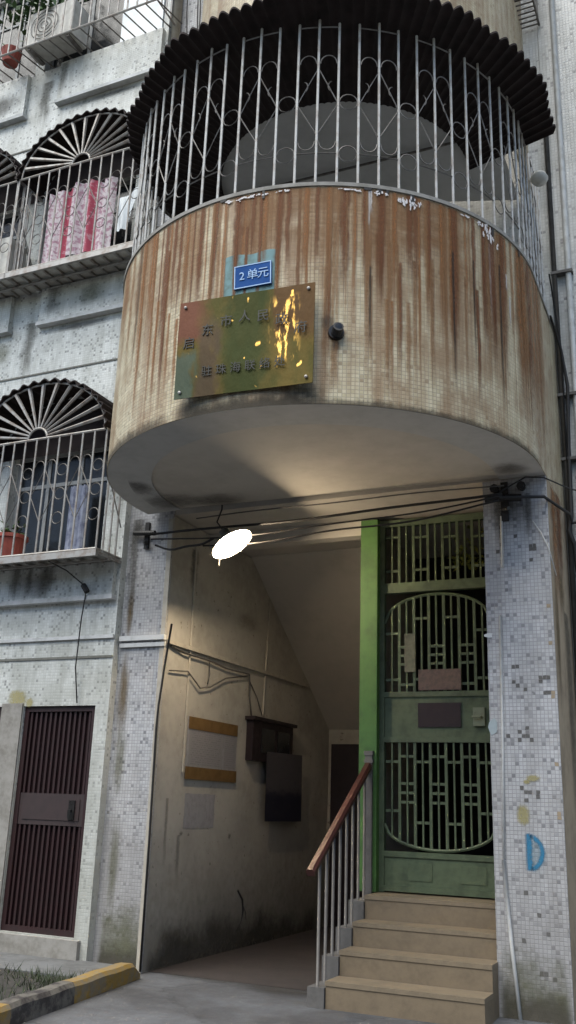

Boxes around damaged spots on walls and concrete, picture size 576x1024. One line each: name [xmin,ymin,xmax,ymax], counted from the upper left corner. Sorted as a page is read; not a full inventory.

peeling [220,189,289,204]
peeling [338,187,422,210]
peeling [460,214,498,250]
corrosion [123,187,544,405]
leakage [149,917,314,970]